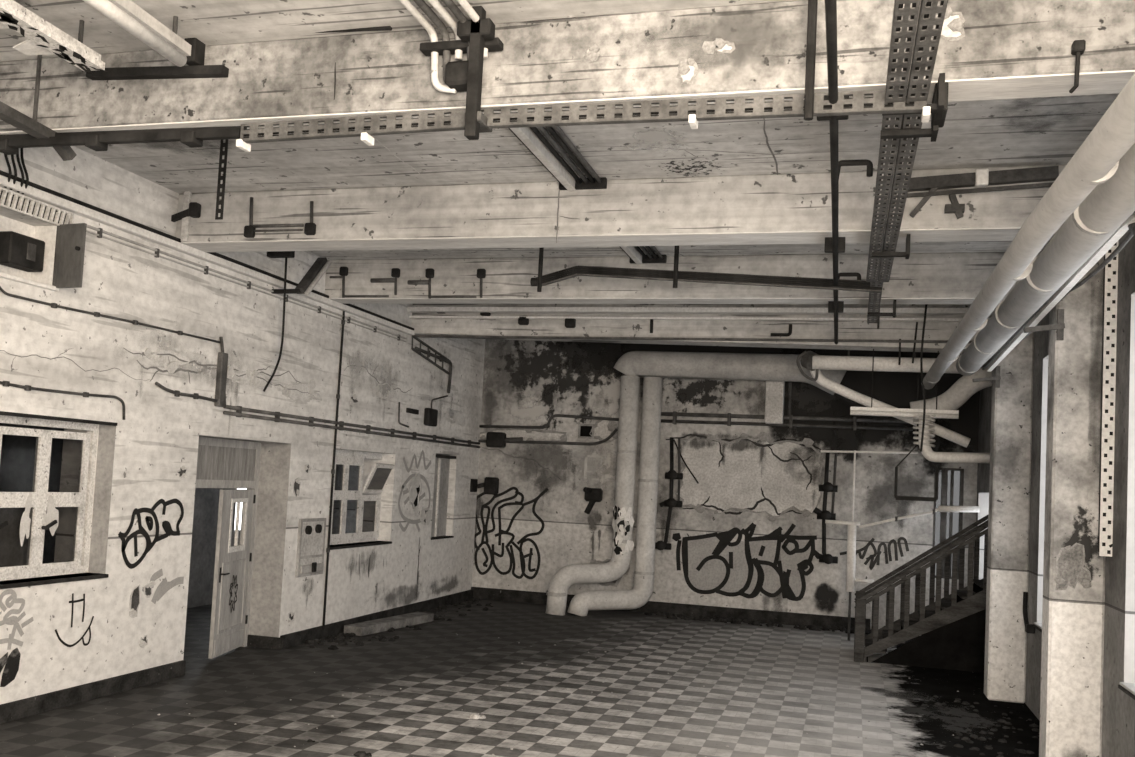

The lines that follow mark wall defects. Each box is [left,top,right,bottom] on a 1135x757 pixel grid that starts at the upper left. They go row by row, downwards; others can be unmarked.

peeling [0,11,107,74]
water stain [483,340,628,429]
crack [666,434,821,515]
peeling [1054,543,1091,590]